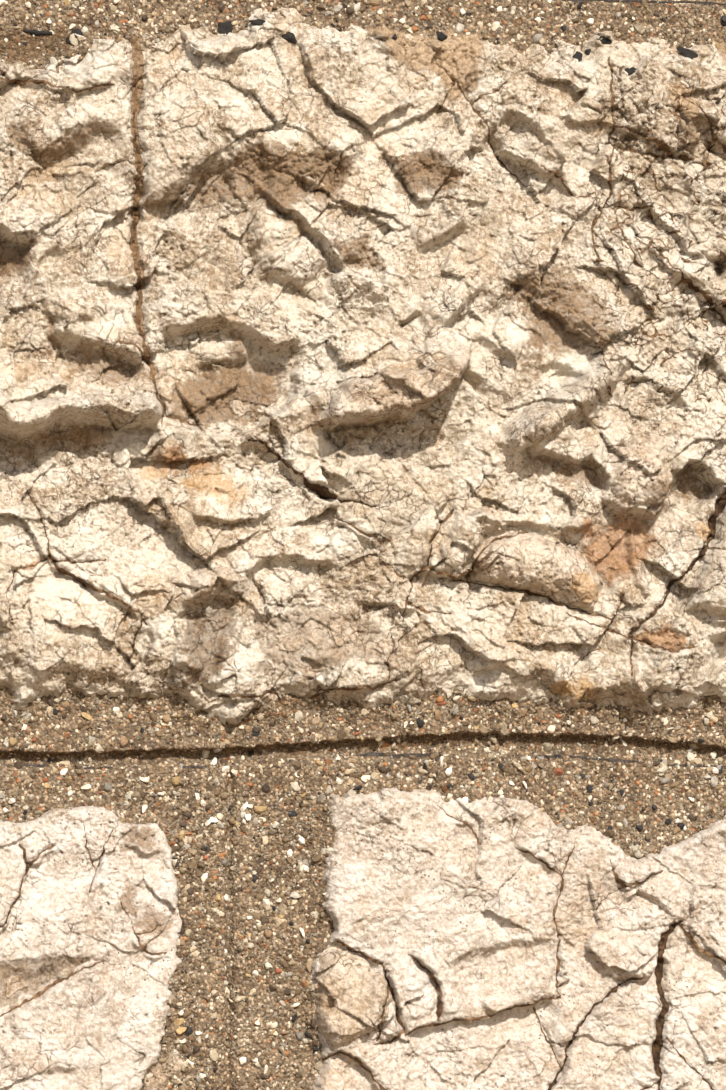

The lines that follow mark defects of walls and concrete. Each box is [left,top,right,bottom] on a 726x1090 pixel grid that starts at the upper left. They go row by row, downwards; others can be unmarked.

crack [0,34,203,425]
crack [437,56,726,411]
crack [218,439,726,792]
crack [0,844,55,927]
crack [0,961,104,1017]
crack [83,823,113,893]
crack [120,901,167,956]
crack [322,845,726,1090]